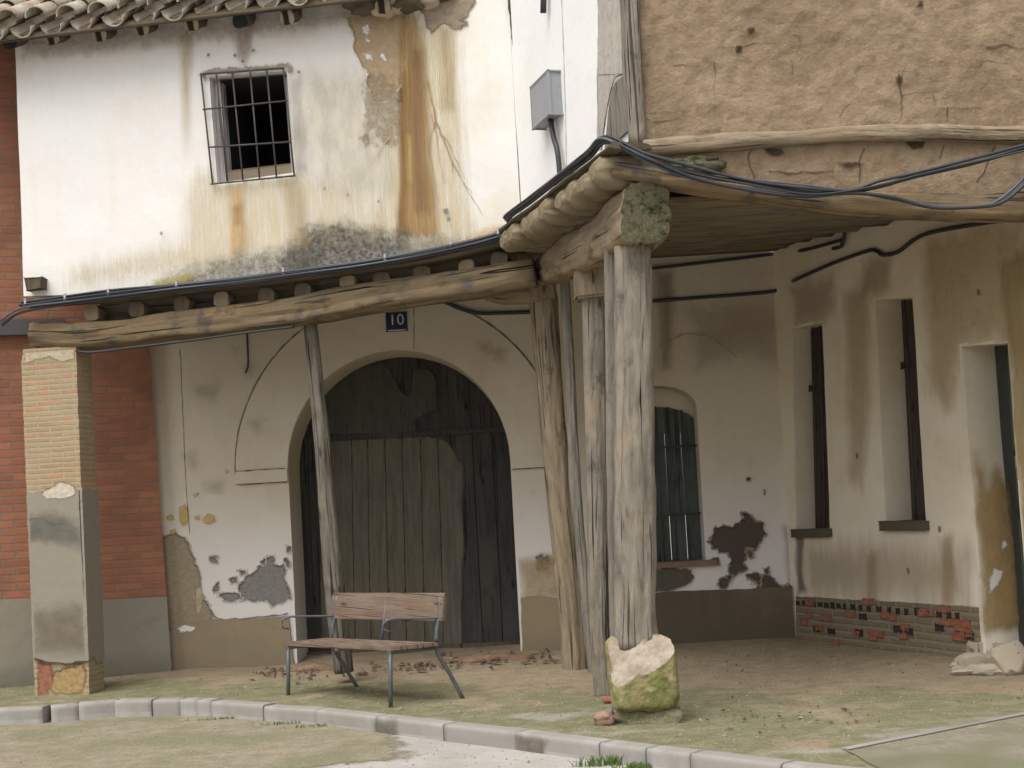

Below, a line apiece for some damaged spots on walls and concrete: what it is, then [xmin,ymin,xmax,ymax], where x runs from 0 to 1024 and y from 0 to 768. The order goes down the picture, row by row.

flaking render [343,12,408,145]
flaking render [420,0,476,33]
leakage [82,28,471,282]
crack [426,80,481,212]
spalling [42,482,75,499]
flaking render [162,493,293,633]
peeling [656,568,694,592]
peeling [706,511,791,590]
peeling [977,470,1019,630]
spalling [37,662,86,695]